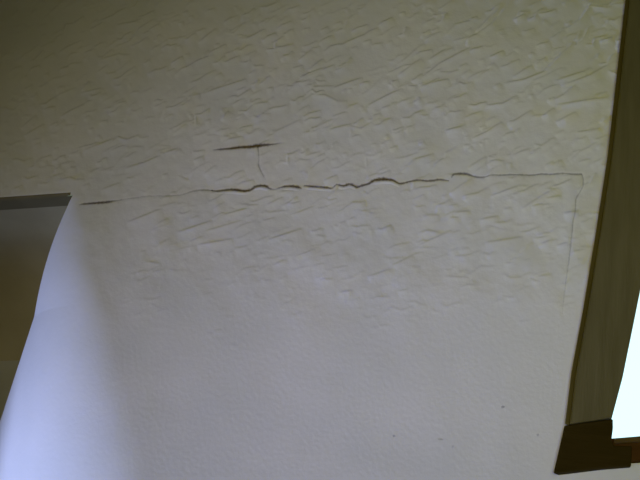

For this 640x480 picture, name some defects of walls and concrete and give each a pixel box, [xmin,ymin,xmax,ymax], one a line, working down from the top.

crack [218,143,273,151]
crack [214,173,472,195]